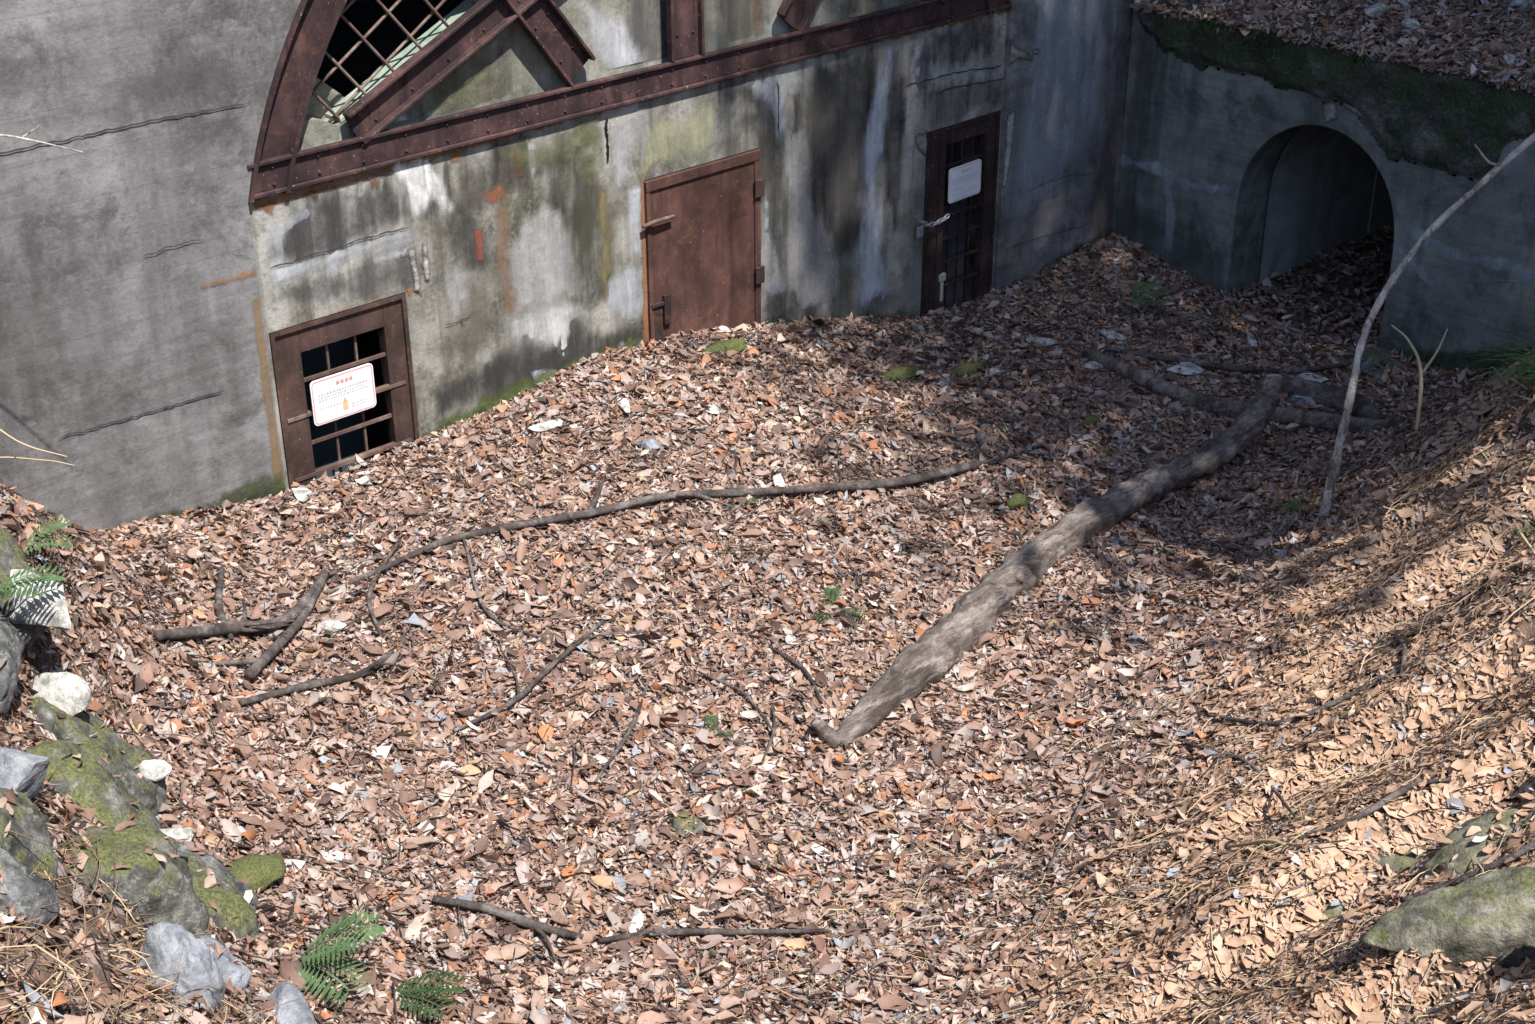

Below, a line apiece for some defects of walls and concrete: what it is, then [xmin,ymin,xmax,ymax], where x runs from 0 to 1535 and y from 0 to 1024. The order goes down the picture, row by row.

crack [0,103,247,154]
damp [270,143,535,298]
rust [253,117,578,213]
damp [438,147,644,415]
damp [618,132,640,227]
rust [641,179,649,343]
damp [719,20,991,318]
crack [59,389,230,439]
rust [257,301,284,483]